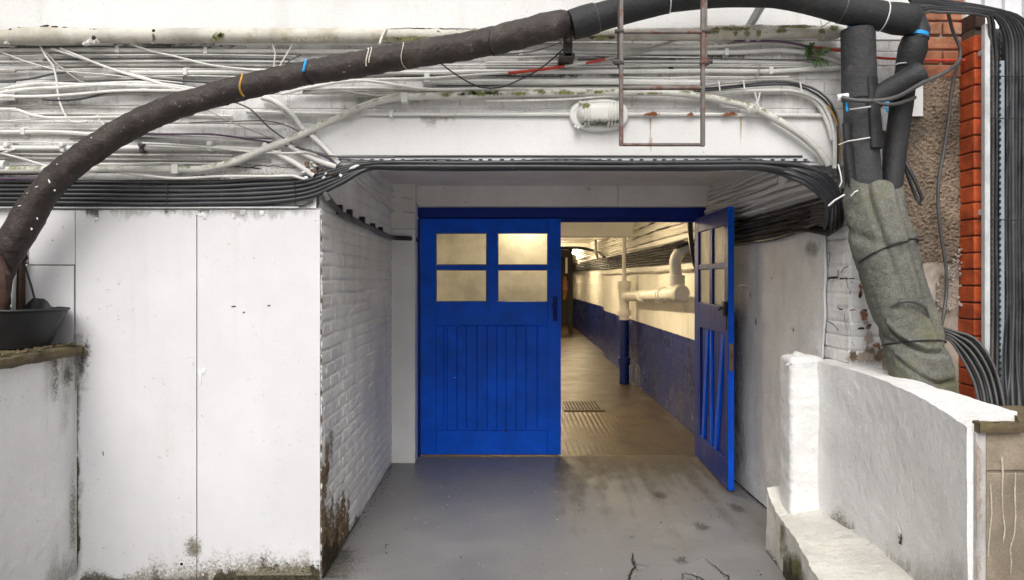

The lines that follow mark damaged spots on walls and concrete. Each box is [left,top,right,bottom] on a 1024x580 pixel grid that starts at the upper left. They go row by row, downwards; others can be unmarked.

spalling [845,283,888,370]
peeling [923,248,963,390]
water stain [52,342,90,563]
mould [185,538,201,557]